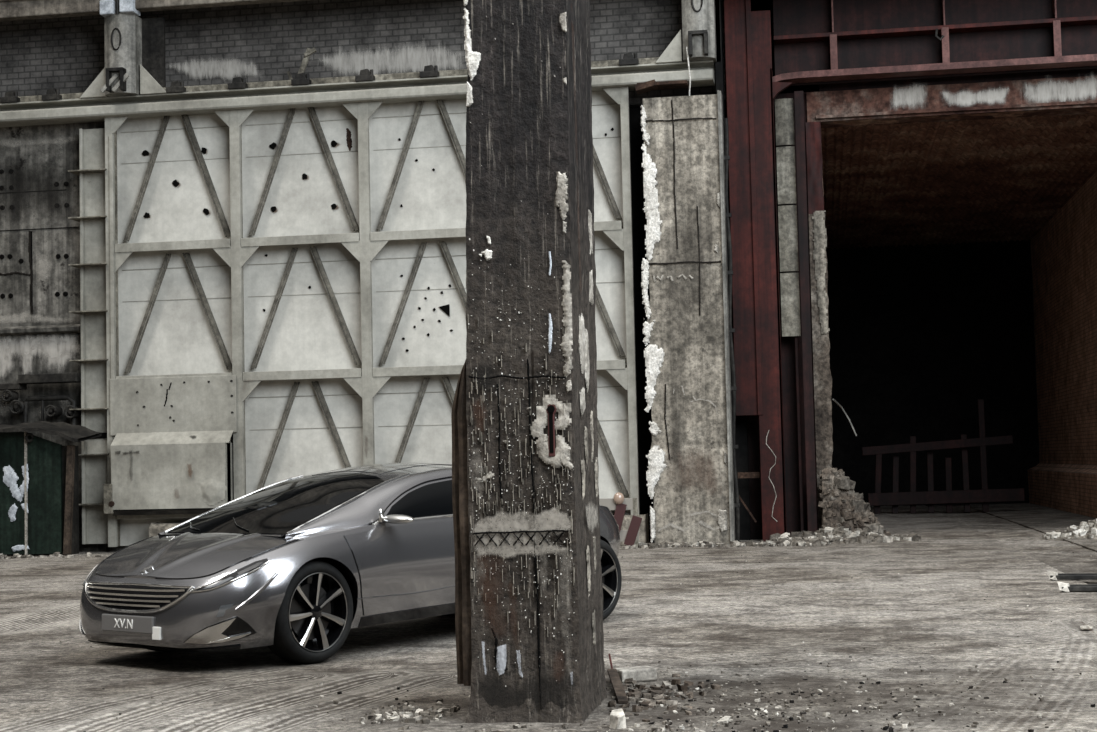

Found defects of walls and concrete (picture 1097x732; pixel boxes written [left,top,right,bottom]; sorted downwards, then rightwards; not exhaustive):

peeling [463,0,481,107]
peeling [893,85,924,107]
peeling [943,88,1008,106]
peeling [1026,76,1097,103]
spalling [641,105,727,543]
spalling [526,251,599,597]
spalling [474,508,570,557]